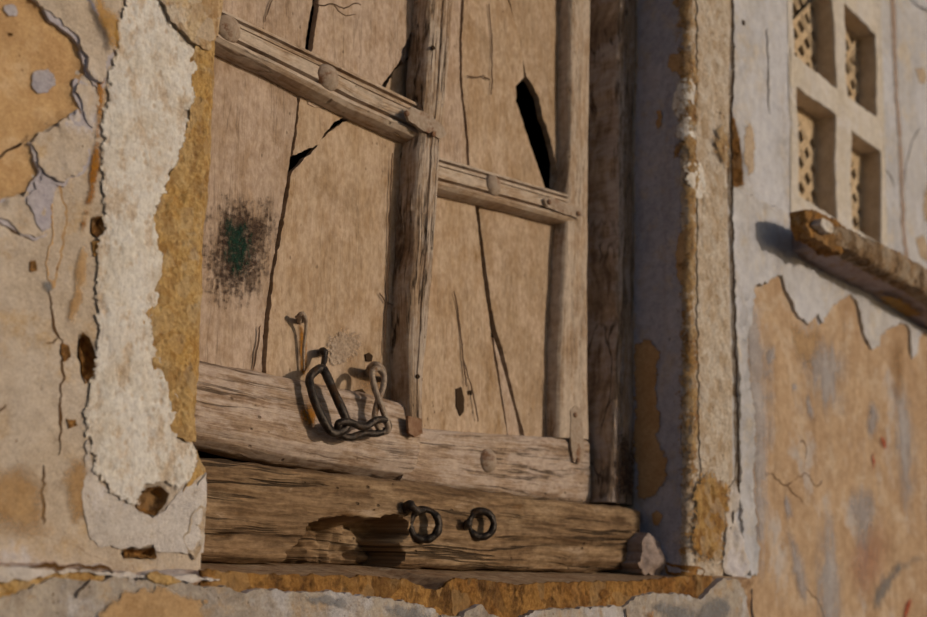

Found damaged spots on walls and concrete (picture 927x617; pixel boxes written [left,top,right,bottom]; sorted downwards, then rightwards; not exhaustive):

crack [0,123,47,159]
rust [82,81,104,227]
spalling [0,0,224,505]
crack [727,0,822,530]
peeling [668,0,927,617]
crack [40,291,66,524]
peeling [633,339,668,499]
spalling [0,566,121,597]
spalling [98,505,713,617]